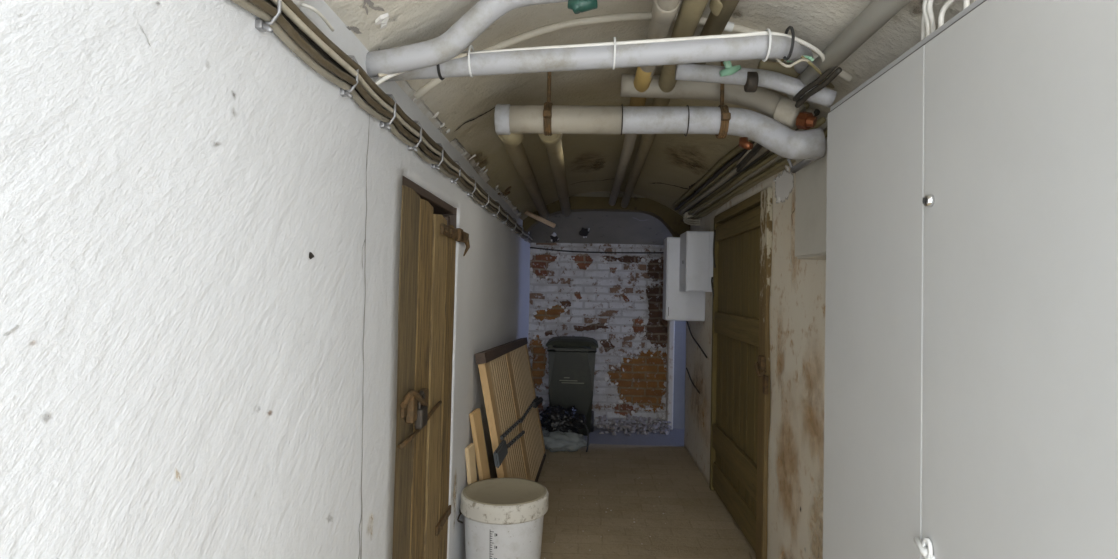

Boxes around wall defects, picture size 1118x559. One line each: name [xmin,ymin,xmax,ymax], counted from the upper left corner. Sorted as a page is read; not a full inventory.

spalling [375,13,389,29]
spalling [530,233,668,416]